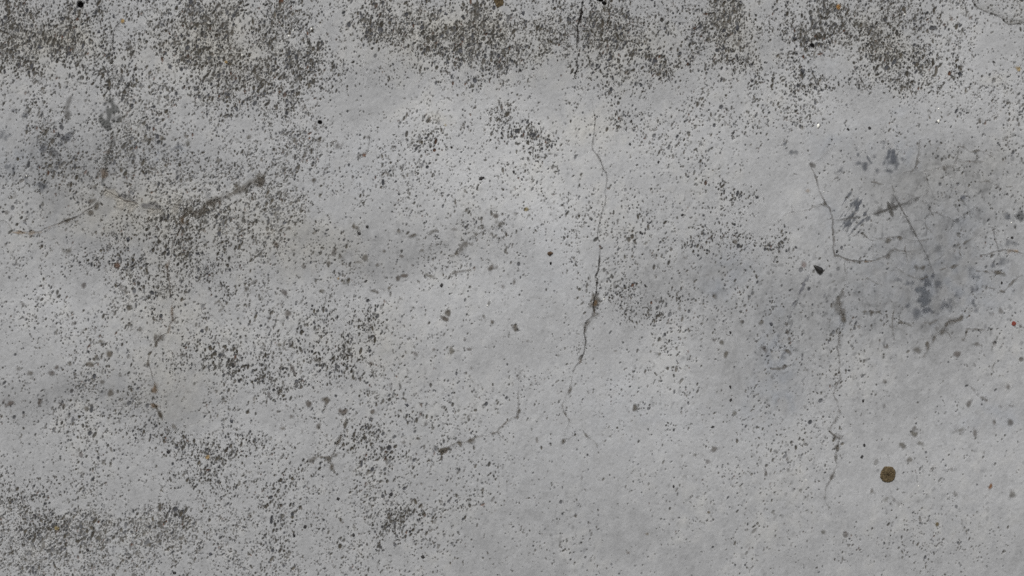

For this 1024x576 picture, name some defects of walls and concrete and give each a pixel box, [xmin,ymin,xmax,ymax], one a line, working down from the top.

crack [810,163,917,262]
crack [569,257,600,392]